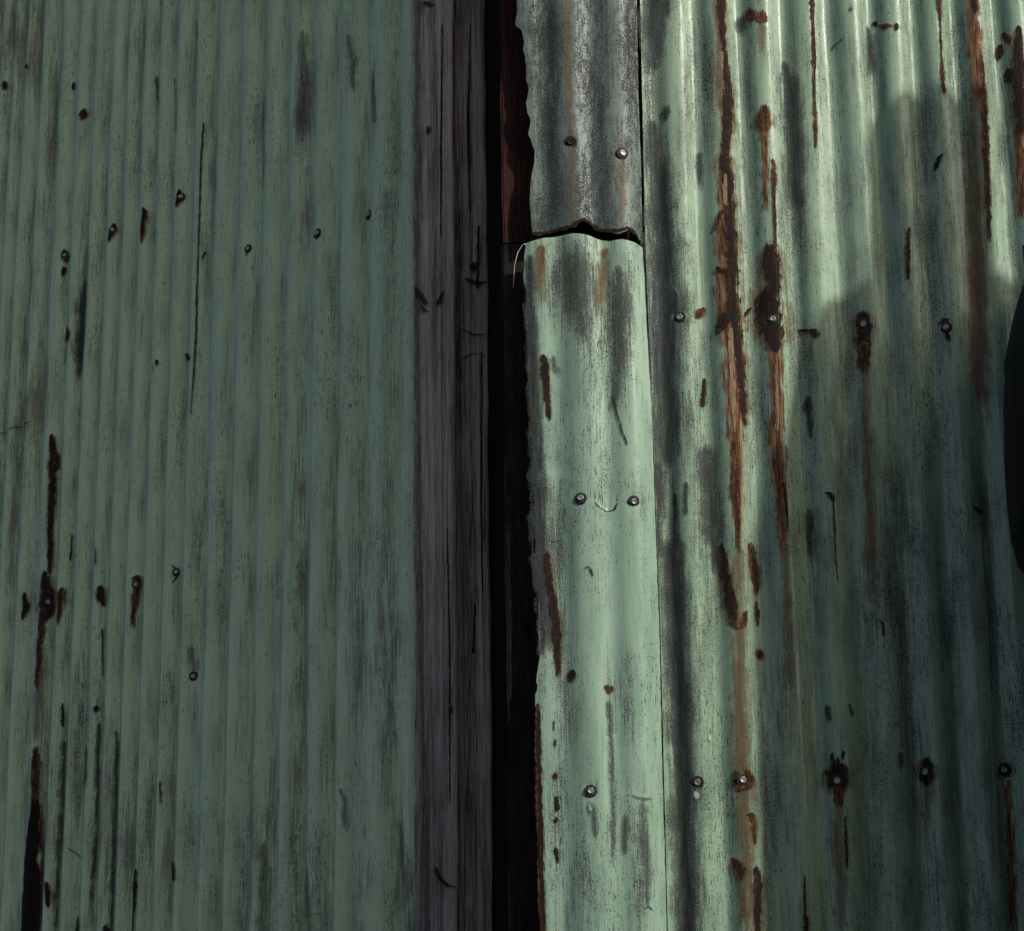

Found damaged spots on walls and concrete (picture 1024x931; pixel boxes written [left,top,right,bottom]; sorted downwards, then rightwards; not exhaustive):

rust [965,0,1024,241]
rust [540,354,561,420]
rust [713,0,795,629]
rust [852,310,877,372]
rust [34,434,68,689]
rust [130,575,142,628]
rust [542,541,566,677]
rust [730,858,765,931]
rust [817,750,856,869]
rust [997,762,1018,931]